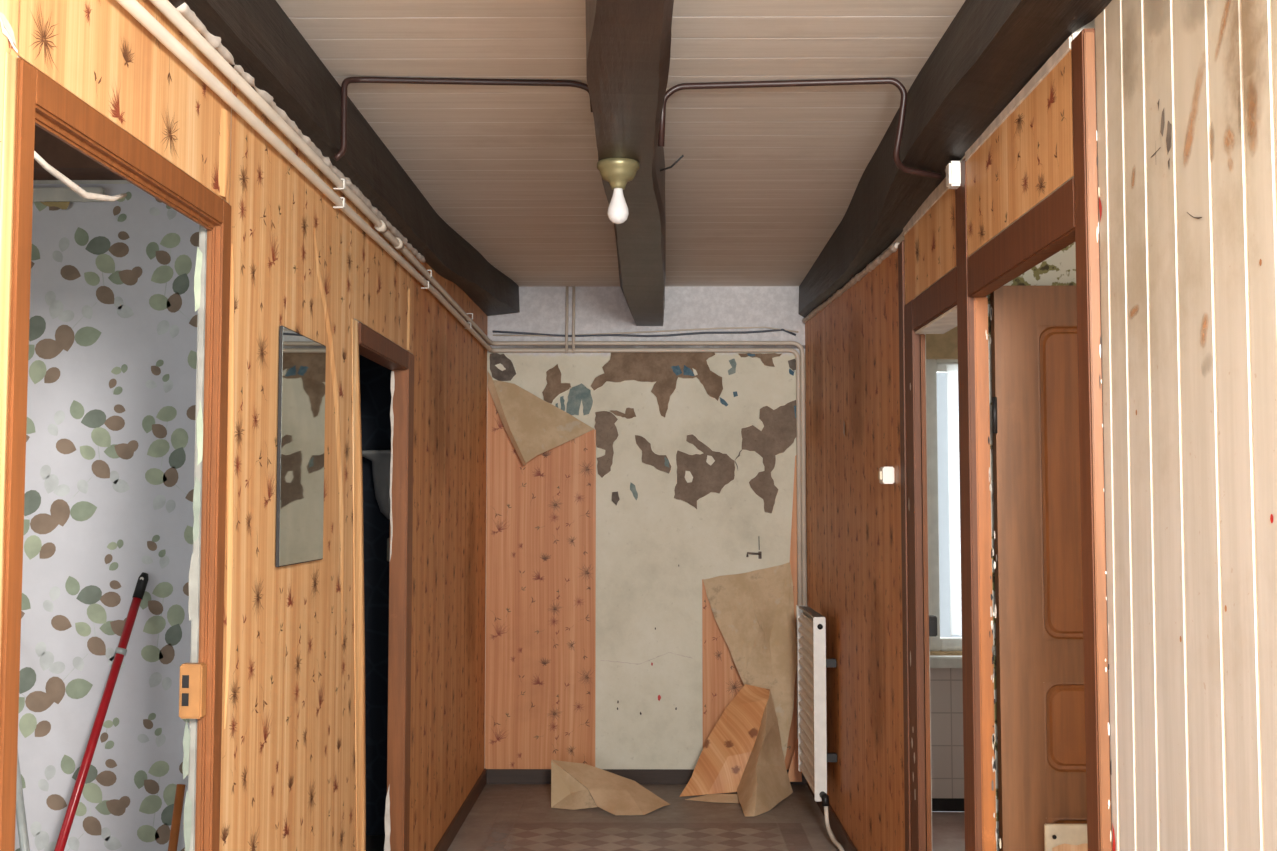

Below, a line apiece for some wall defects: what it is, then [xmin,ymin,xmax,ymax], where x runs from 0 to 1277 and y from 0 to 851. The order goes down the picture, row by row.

peeling [489,352,517,382]
peeling [611,483,638,506]
peeling [542,352,796,478]
peeling [634,399,796,514]